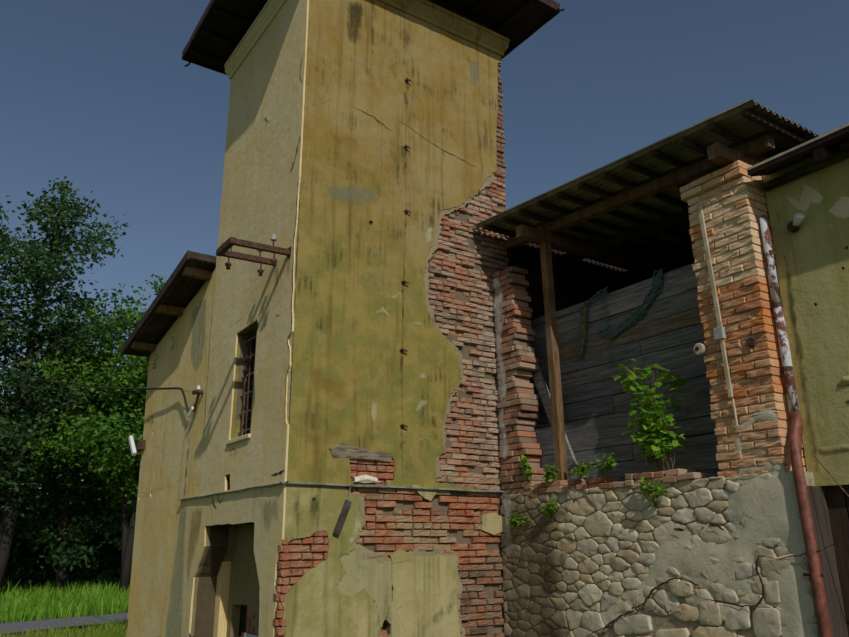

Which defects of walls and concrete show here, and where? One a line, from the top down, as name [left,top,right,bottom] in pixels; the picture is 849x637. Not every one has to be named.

crack [357,109,477,168]
peeling [828,196,849,219]
damp [191,301,205,368]
peeling [285,189,300,425]
flaking render [329,63,509,637]
damp [166,511,185,637]
flaking render [273,530,328,637]
crack [587,542,838,637]